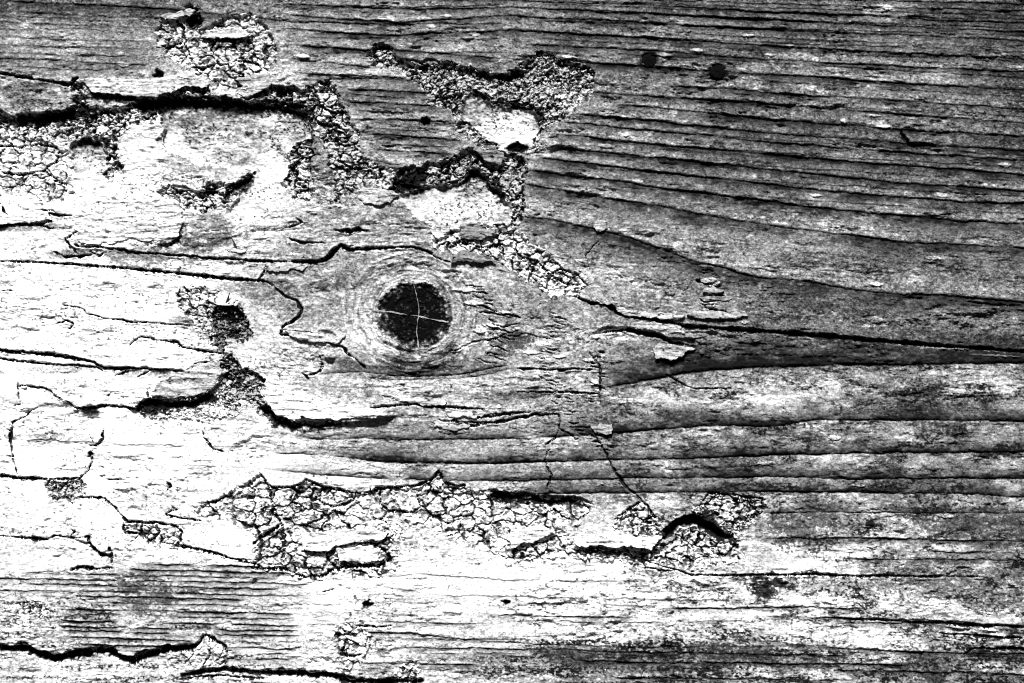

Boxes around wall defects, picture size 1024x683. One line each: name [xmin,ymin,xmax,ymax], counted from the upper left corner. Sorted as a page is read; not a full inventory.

spalling [0,4,596,298]
crack [0,203,451,380]
spalling [131,286,387,423]
crack [370,269,1024,518]
spalling [193,470,766,581]
crack [0,634,423,683]